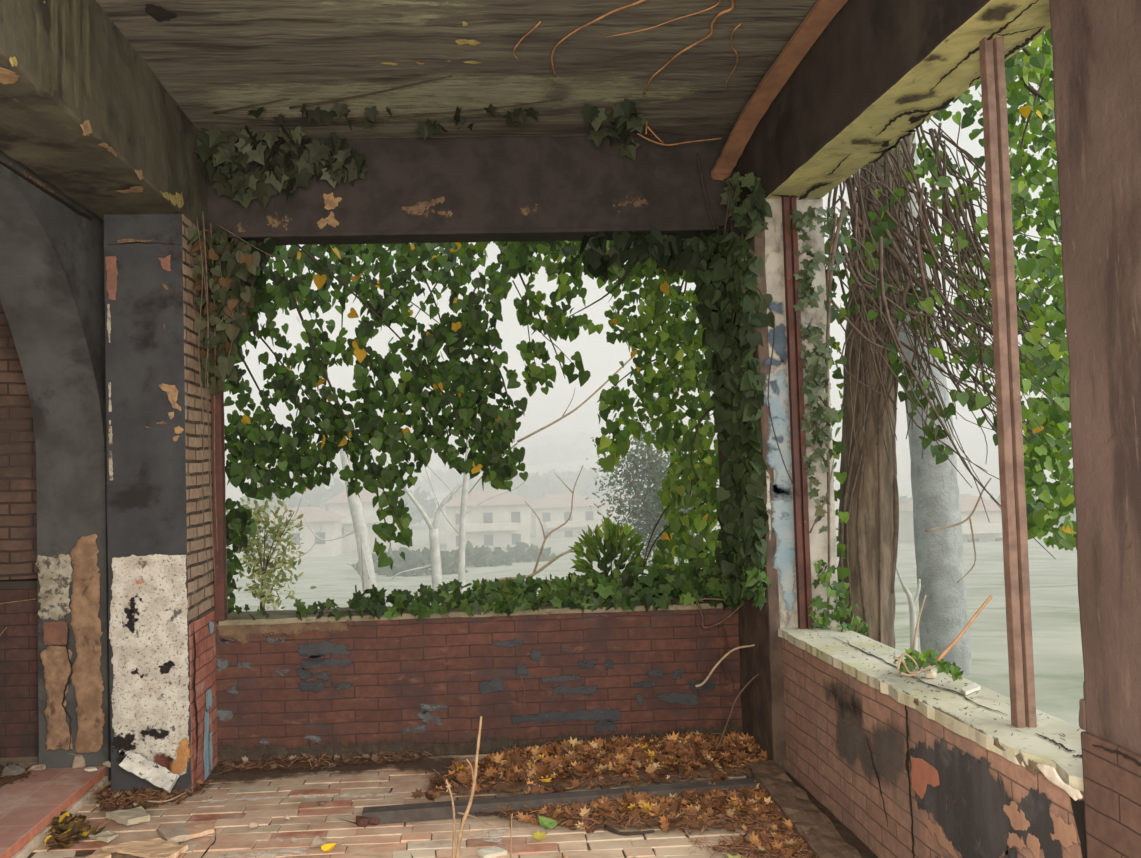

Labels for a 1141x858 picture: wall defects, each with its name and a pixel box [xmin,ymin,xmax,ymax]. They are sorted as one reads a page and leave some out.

spalling [0,57,20,85]
crack [771,0,1045,200]
flaking render [317,192,342,229]
flaking render [401,196,452,218]
peeling [35,534,190,776]
peeling [825,684,1082,858]